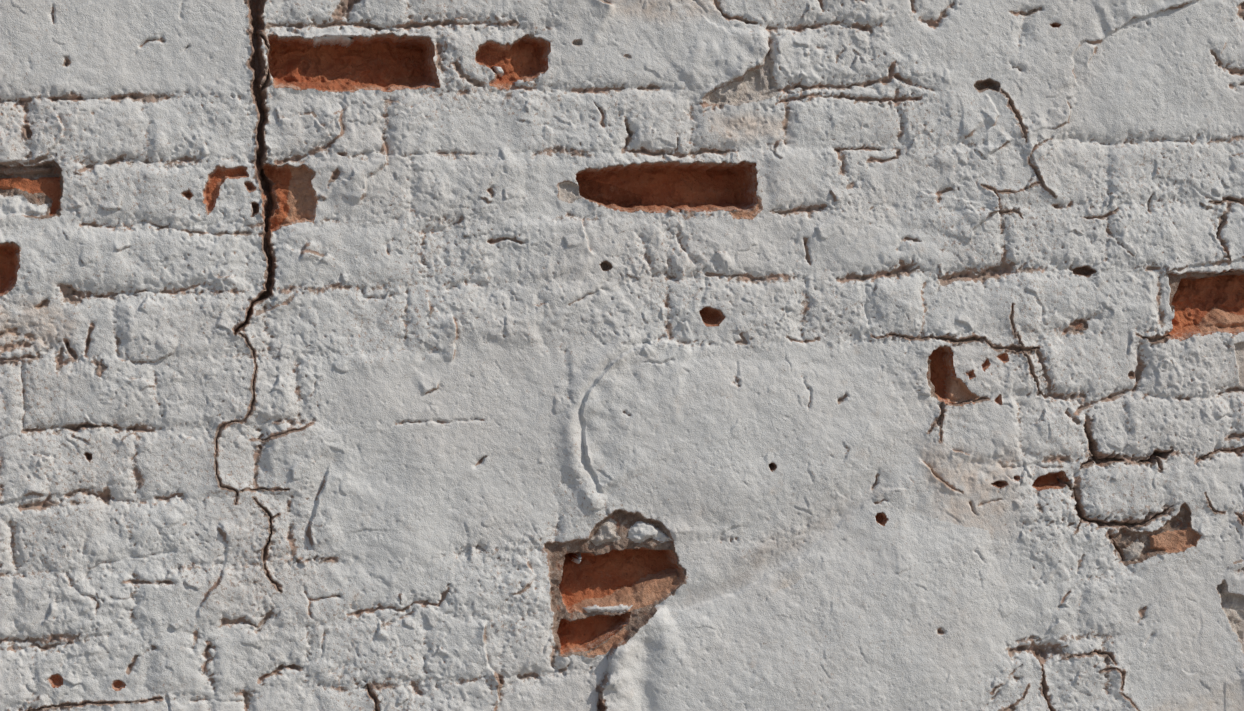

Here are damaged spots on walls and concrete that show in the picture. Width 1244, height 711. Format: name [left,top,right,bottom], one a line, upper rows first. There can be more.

spalling [267,34,440,147]
spalling [475,35,551,91]
spalling [182,164,319,232]
spalling [559,161,763,220]
crack [981,92,1056,218]
crack [216,0,312,592]
crack [889,304,1043,396]
spalling [1162,269,1244,389]
crack [929,398,989,493]
crack [1057,423,1244,561]
spalling [545,510,687,711]
crack [993,651,1140,711]